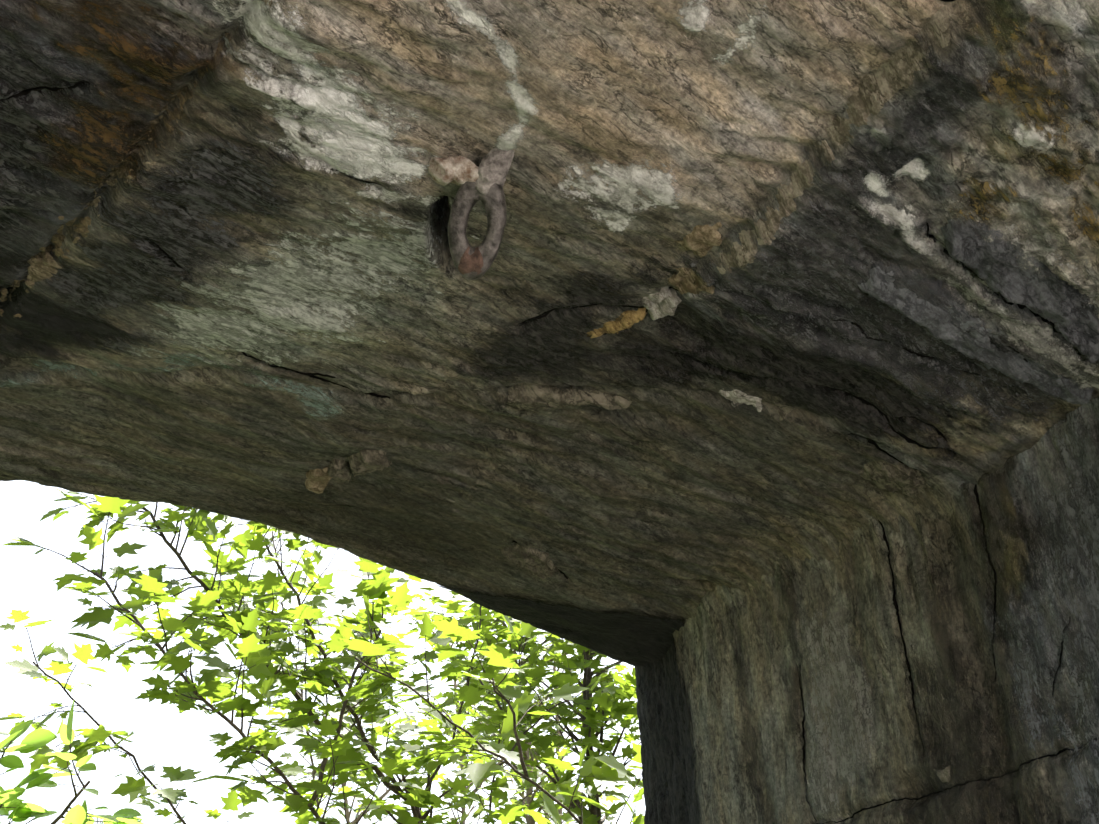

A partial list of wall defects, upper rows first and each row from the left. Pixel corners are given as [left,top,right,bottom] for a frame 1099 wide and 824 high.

water stain [446,0,536,151]
water stain [558,161,679,232]
crack [926,221,1087,357]
crack [242,352,390,399]
crack [878,520,924,756]
crack [973,484,996,681]
crack [1052,617,1071,696]
crack [797,666,1091,824]